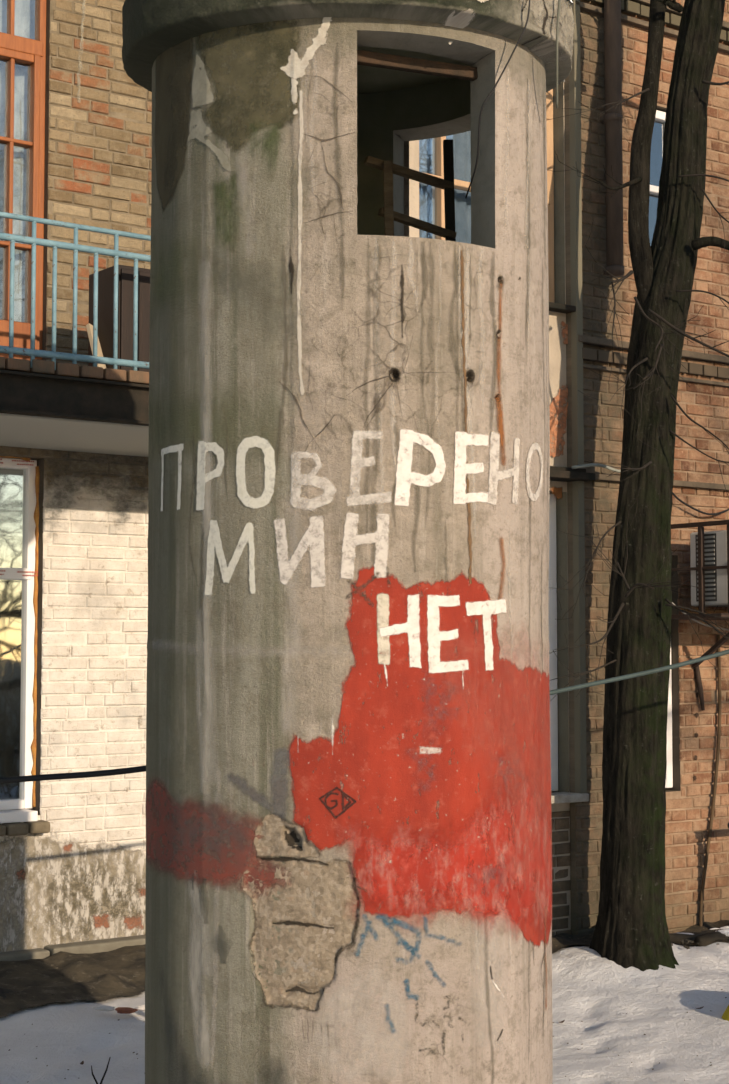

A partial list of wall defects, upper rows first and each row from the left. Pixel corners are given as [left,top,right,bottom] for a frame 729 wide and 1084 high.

peeling [187,53,231,171]
leakage [155,20,300,212]
crack [306,132,355,223]
crack [287,250,295,295]
crack [353,267,409,420]
crack [461,250,472,584]
corrosion [496,283,506,464]
flaking render [550,385,568,457]
leakage [199,594,212,781]
flaking render [0,831,146,952]
leakage [191,873,209,1063]
spalling [243,814,367,1011]